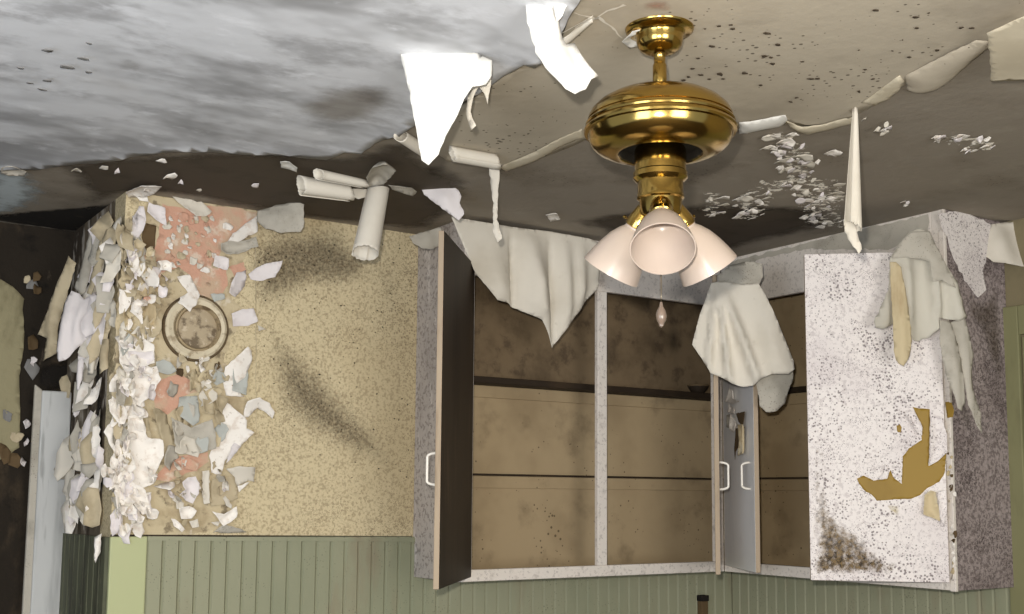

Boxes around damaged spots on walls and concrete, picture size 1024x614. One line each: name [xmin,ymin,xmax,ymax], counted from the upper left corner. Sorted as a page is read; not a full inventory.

peeling [366,161,417,196]
peeling [703,132,846,229]
peeling [873,121,892,136]
peeling [931,134,996,154]
flaking render [938,211,991,297]
flaking render [109,159,282,538]
peeling [857,402,957,580]
damp [818,511,888,570]